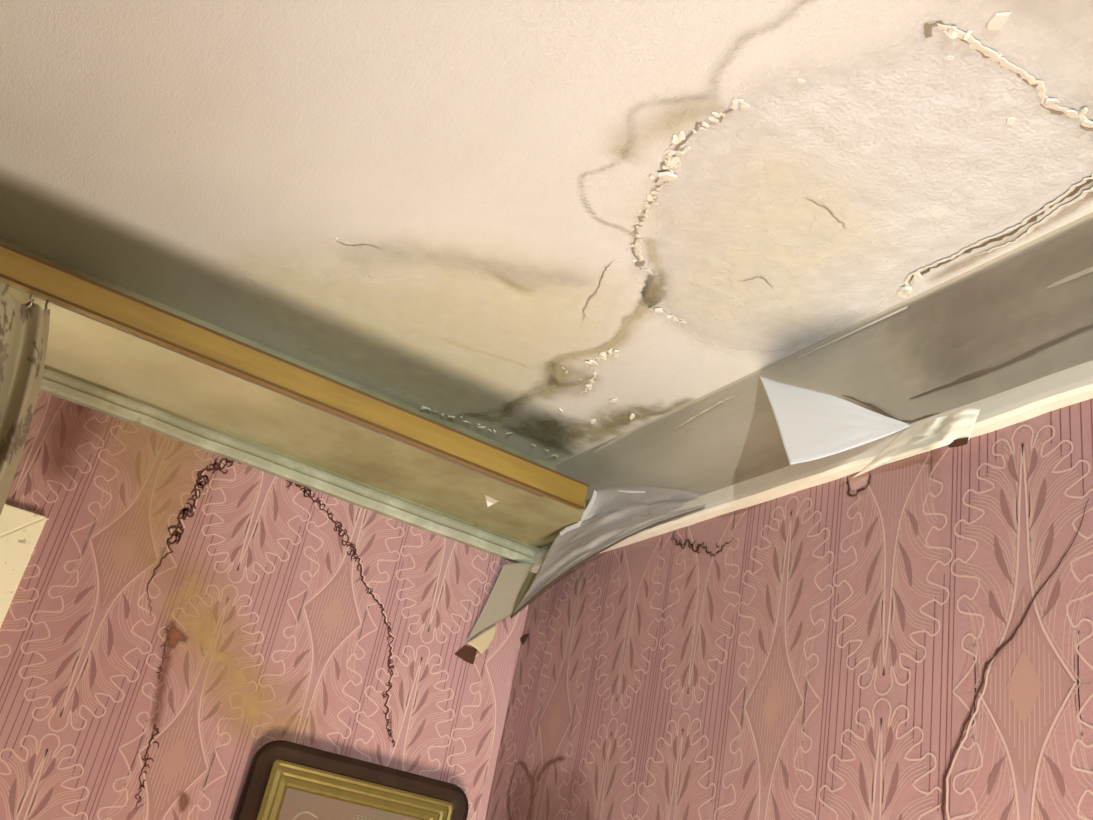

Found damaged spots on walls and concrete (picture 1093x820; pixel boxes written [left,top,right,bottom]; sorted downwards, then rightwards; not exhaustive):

peeling [924,21,1093,131]
damp [1051,192,1093,219]
damp [927,221,1093,351]
damp [275,276,660,421]
peeling [420,406,512,434]
damp [521,402,684,450]
crack [147,458,241,679]
crack [286,480,396,747]
peeling [467,563,536,654]
crack [671,532,719,553]
crack [941,498,1089,820]
crack [135,725,160,808]